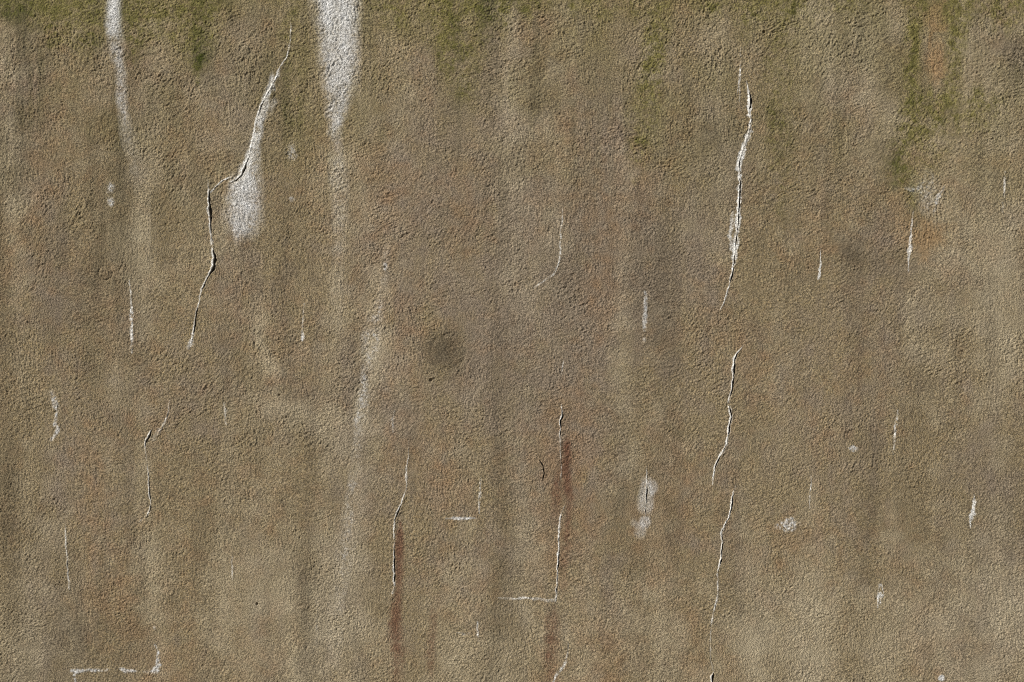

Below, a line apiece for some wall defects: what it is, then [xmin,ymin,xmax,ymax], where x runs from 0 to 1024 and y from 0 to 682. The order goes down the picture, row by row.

water stain [0,0,234,270]
crack [186,17,292,350]
water stain [219,69,279,248]
water stain [306,0,645,341]
crack [718,47,754,312]
crack [139,399,172,523]
crack [390,410,411,595]
crack [497,403,566,603]
corrosion [542,433,577,682]
crack [709,344,745,682]